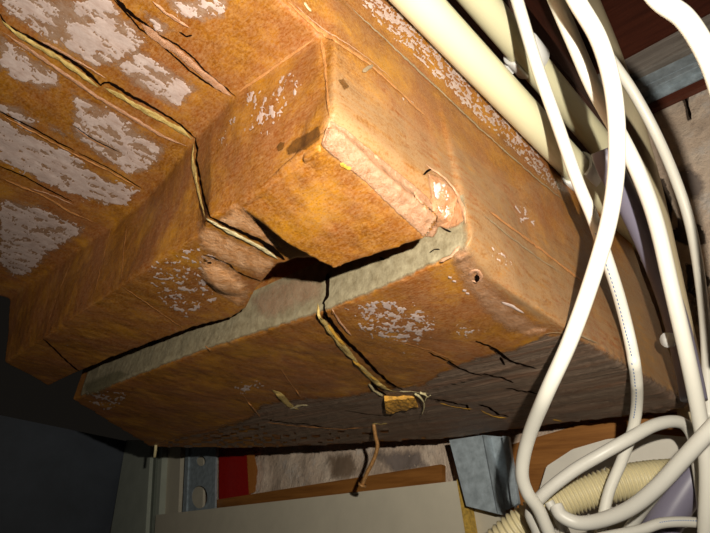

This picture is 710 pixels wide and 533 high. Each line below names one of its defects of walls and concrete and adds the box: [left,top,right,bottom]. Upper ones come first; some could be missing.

crack [0,0,285,260]
peeling [321,121,466,237]
crack [317,274,509,418]
crack [428,341,537,394]